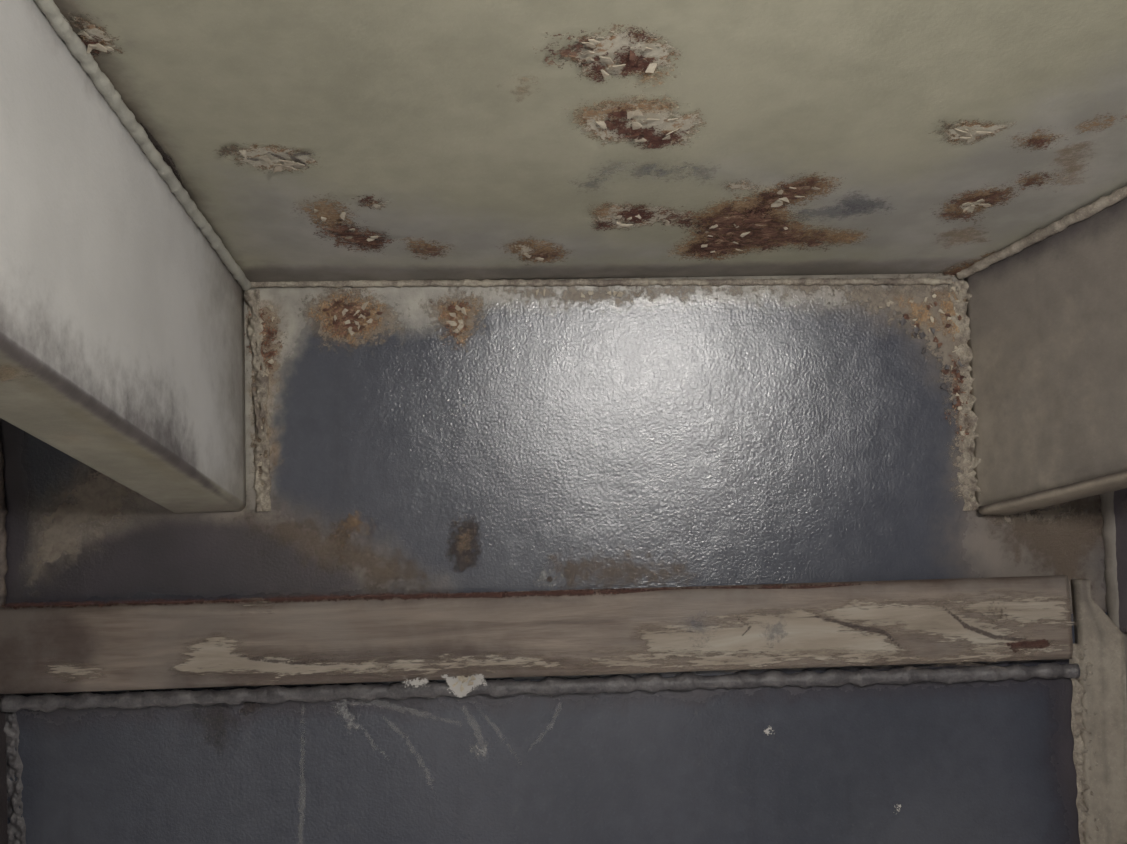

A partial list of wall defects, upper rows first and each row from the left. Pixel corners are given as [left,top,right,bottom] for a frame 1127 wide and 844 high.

peeling [219,145,317,173]
corrosion [302,196,451,259]
corrosion [590,174,865,260]
corrosion [934,171,1059,224]
corrosion [245,304,286,377]
corrosion [303,287,403,350]
corrosion [422,288,486,352]
leakage [32,470,139,579]
leakage [447,517,481,572]
peeling [578,594,1074,675]
peeling [48,663,102,679]
peeling [171,637,563,698]